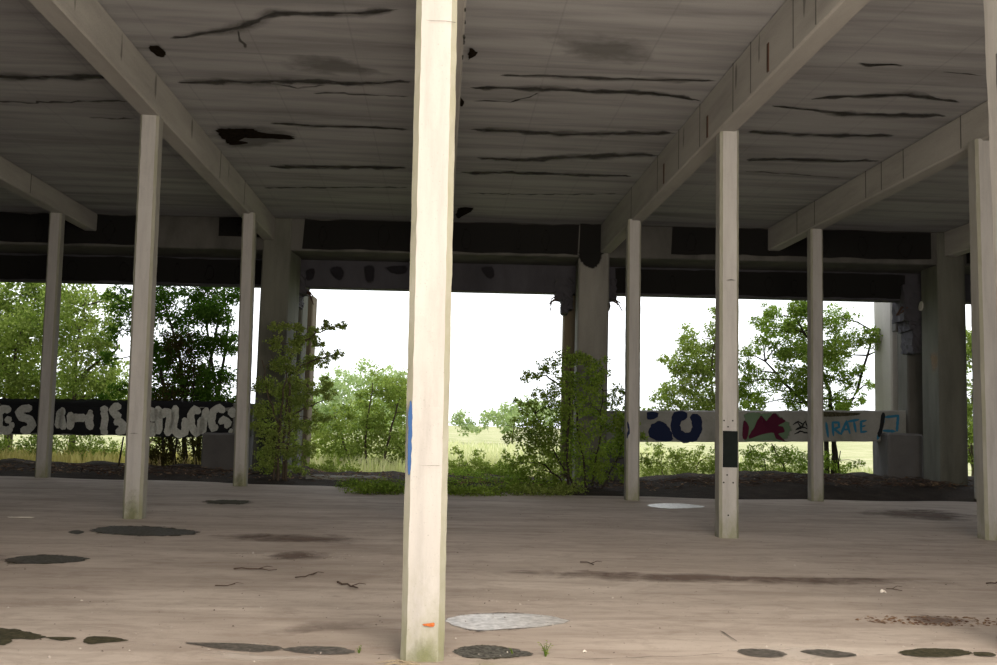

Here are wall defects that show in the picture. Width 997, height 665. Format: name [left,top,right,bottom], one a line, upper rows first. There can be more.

crack [173,9,397,47]
spalling [149,46,166,57]
crack [861,61,901,69]
crack [815,93,957,103]
spalling [215,128,295,146]
spalling [455,207,473,218]
leakage [737,648,787,657]
leakage [801,649,856,657]
leakage [898,648,996,657]